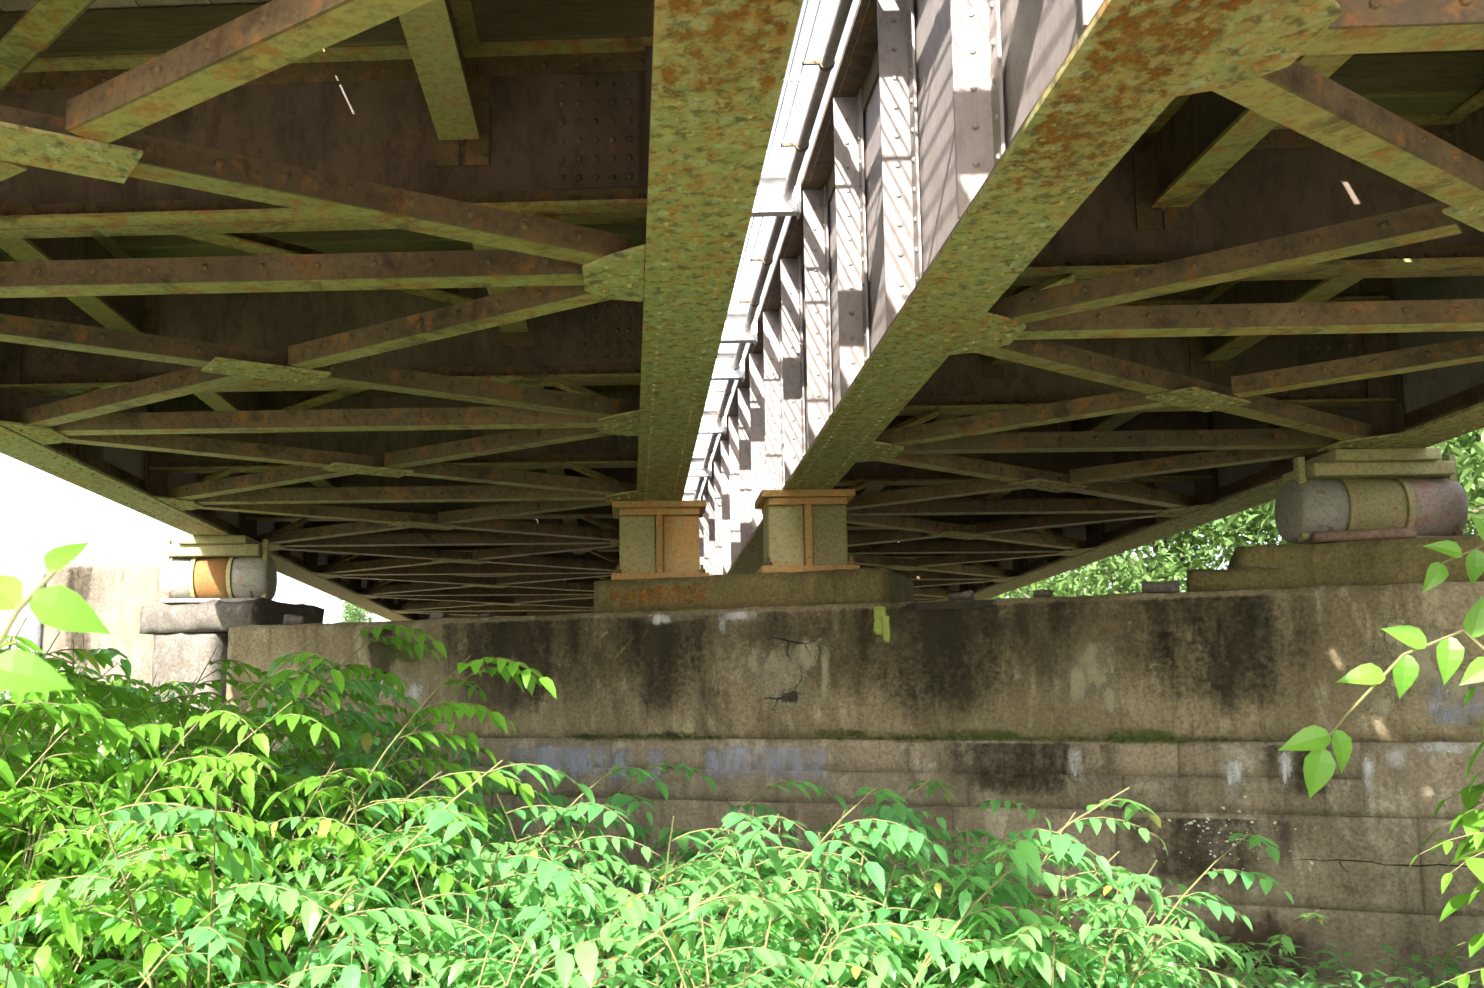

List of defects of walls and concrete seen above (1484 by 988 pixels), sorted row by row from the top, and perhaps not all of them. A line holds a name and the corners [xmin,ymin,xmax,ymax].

corrosion [662,0,787,135]
corrosion [982,0,1251,210]
water stain [459,605,1070,711]
water stain [1104,596,1274,710]
water stain [1159,818,1257,881]
crack [1265,858,1467,873]